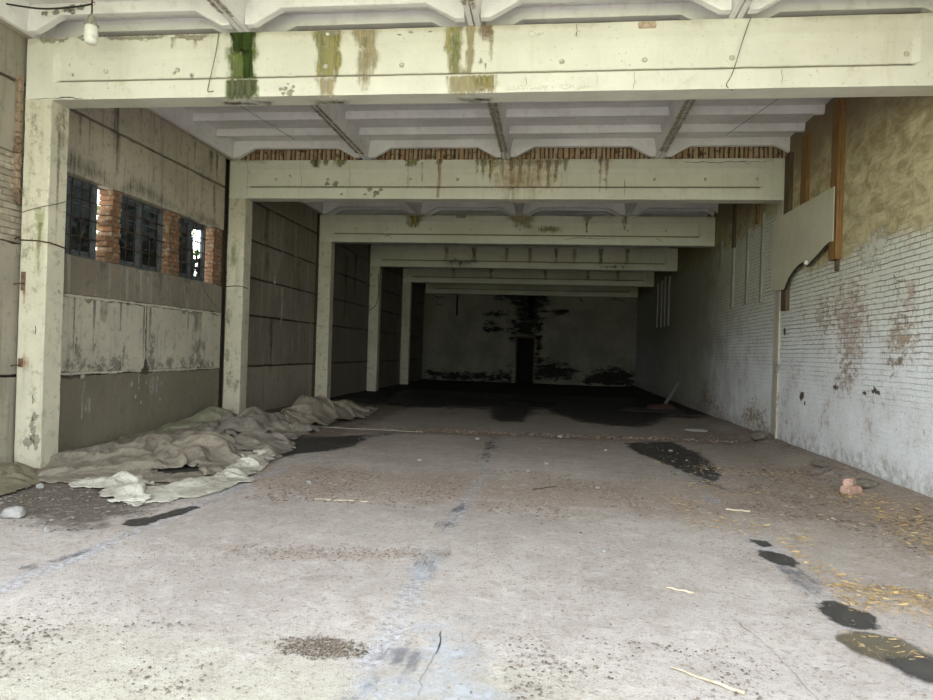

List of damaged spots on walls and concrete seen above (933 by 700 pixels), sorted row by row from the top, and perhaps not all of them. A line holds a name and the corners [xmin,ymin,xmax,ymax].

leakage [227,32,257,78]
leakage [313,30,344,104]
leakage [352,29,377,82]
leakage [444,25,494,102]
corrosion [476,103,569,188]
leakage [530,335,635,386]
spalling [23,413,40,450]